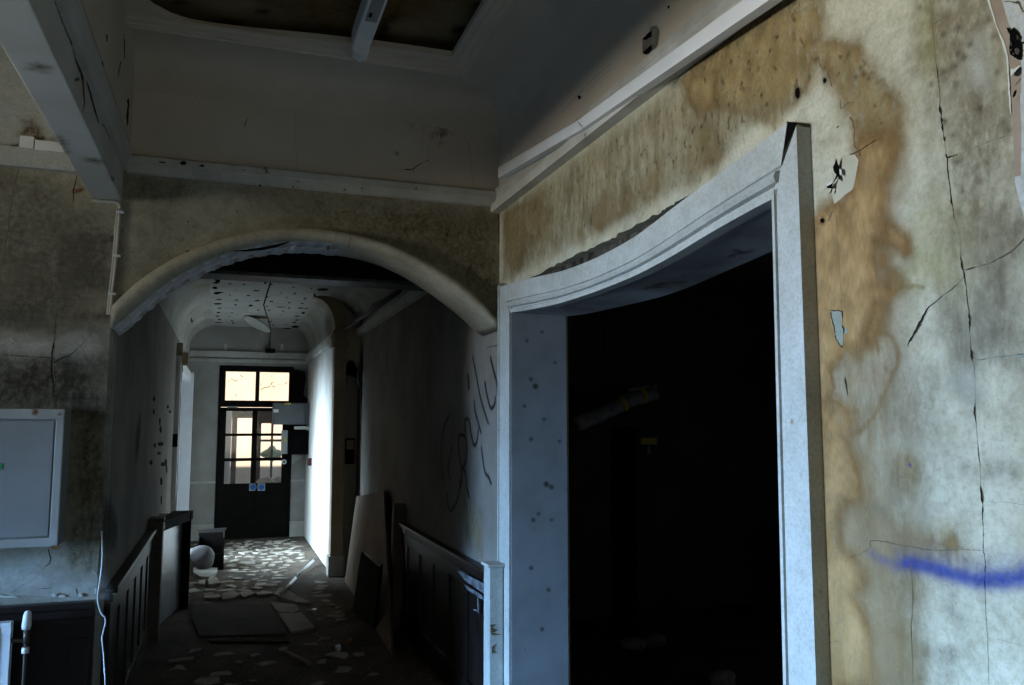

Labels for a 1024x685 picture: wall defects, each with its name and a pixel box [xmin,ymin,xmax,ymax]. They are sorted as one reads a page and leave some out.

crack [1,231,96,405]
spalling [550,223,653,274]
damp [504,0,960,685]
spalling [826,158,841,194]
peeling [830,310,848,347]
crack [846,1,1024,680]
damp [0,336,117,553]